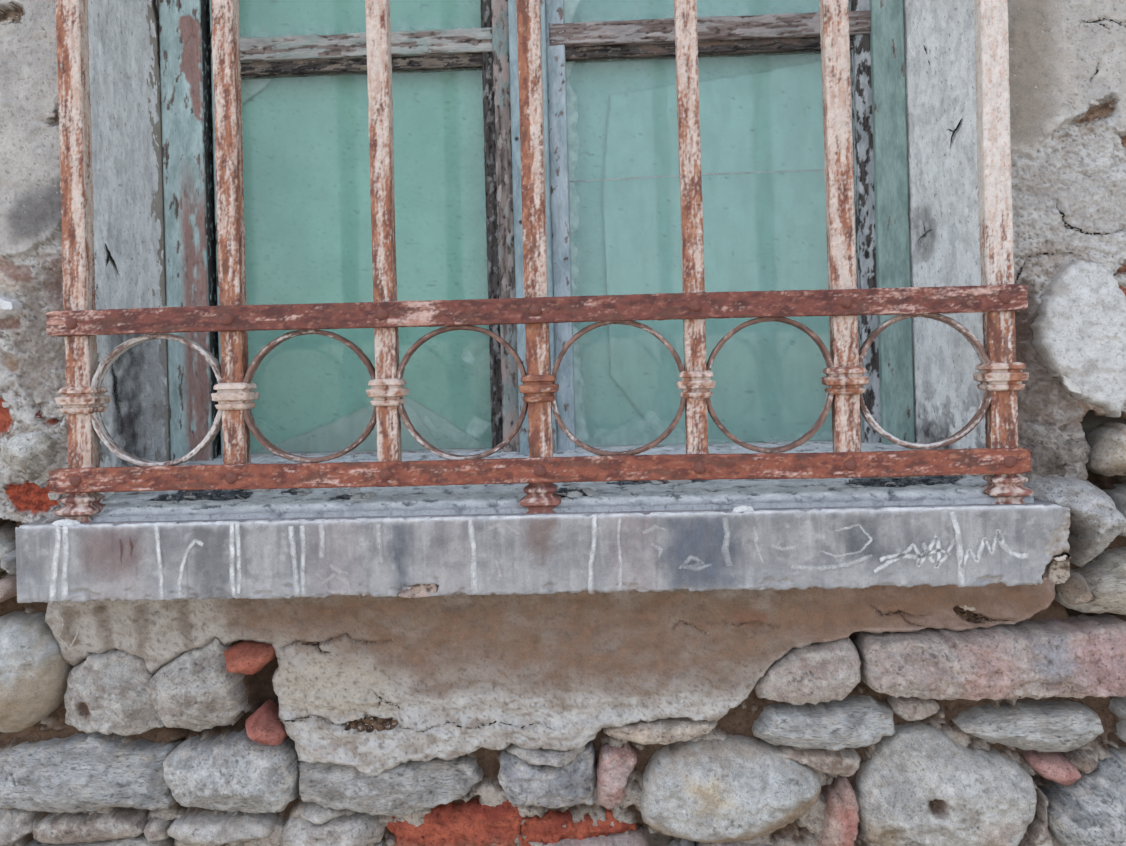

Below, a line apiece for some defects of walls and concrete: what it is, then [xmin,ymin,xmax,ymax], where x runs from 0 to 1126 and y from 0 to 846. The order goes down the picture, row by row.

spalling [0,2,25,26]
crack [1084,18,1126,27]
flaking render [45,110,59,127]
flaking render [1068,97,1126,155]
flaking render [1114,262,1126,296]
flaking render [0,396,14,438]
flaking render [33,397,65,428]
flaking render [3,480,61,519]